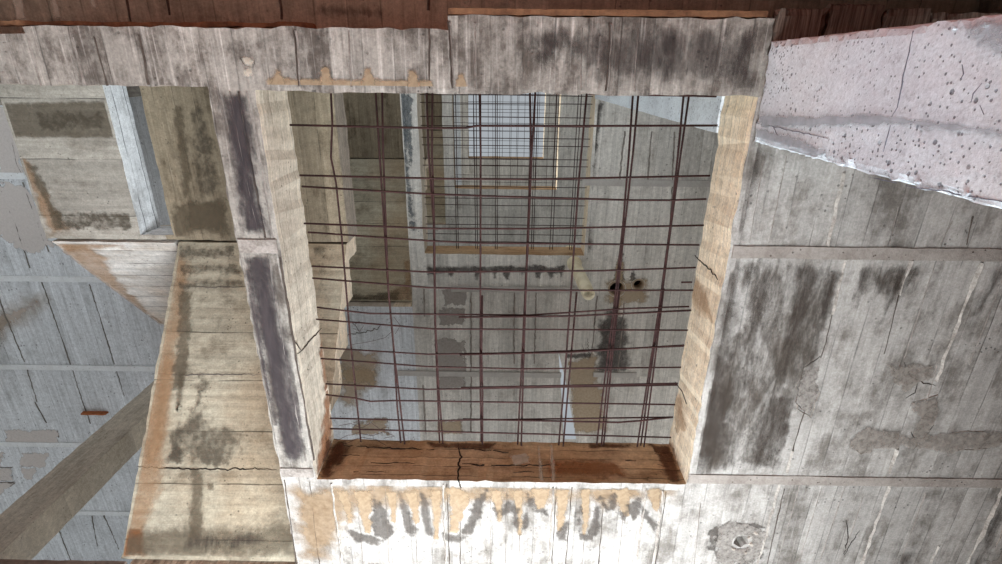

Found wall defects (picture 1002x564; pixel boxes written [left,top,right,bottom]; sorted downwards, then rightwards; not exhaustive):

damp [267,67,433,87]
damp [572,29,751,79]
rust [65,244,147,314]
damp [173,96,305,460]
rust [124,359,171,556]
damp [126,382,290,556]
rust [318,343,349,477]
crack [343,445,434,473]
rust [292,443,679,557]
crack [457,447,551,488]
spalling [708,521,767,564]
damp [697,267,838,473]